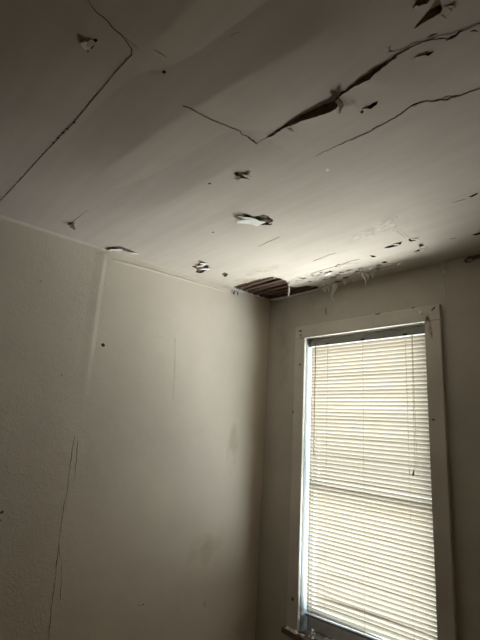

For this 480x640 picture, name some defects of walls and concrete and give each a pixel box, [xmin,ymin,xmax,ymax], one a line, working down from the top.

spalling [412,0,456,29]
crack [1,2,134,200]
crack [183,23,480,144]
crack [317,88,480,156]
peeling [235,215,274,226]
peeling [192,261,210,273]
peeling [232,255,405,301]
crack [48,438,78,637]